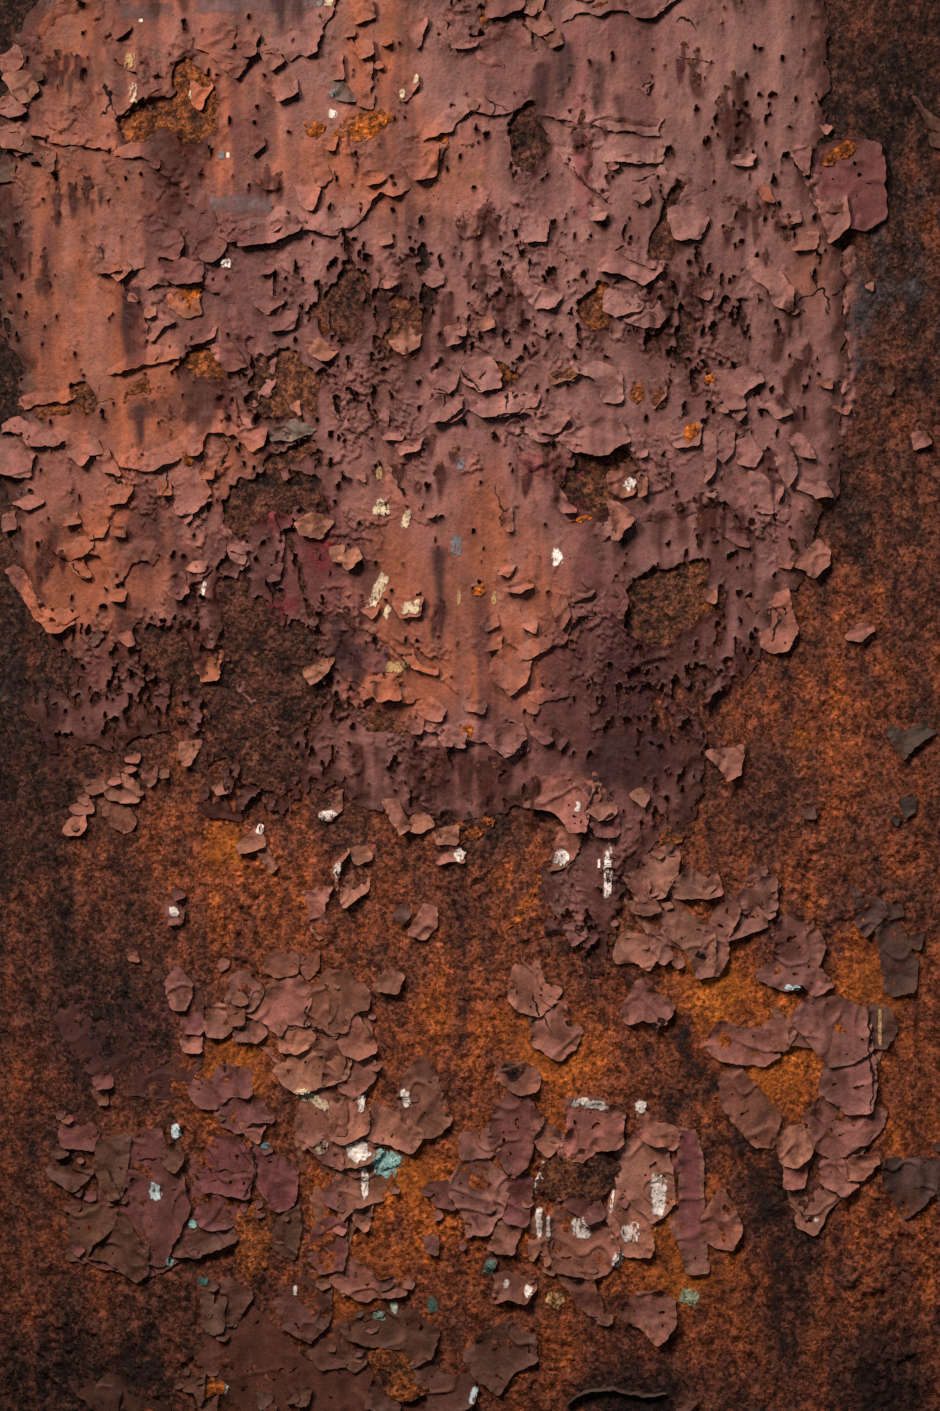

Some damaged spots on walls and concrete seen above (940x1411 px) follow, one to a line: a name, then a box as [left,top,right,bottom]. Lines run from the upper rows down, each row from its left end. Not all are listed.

rust [119,56,218,209]
rust [572,280,620,331]
rust [648,184,685,345]
rust [222,348,330,537]
peeling [0,0,888,980]
rust [522,450,637,523]
rust [625,557,725,647]
rust [120,549,540,845]
peeling [850,885,924,997]
peeling [45,845,743,1411]
rust [535,1148,621,1204]
peeling [702,915,940,1236]